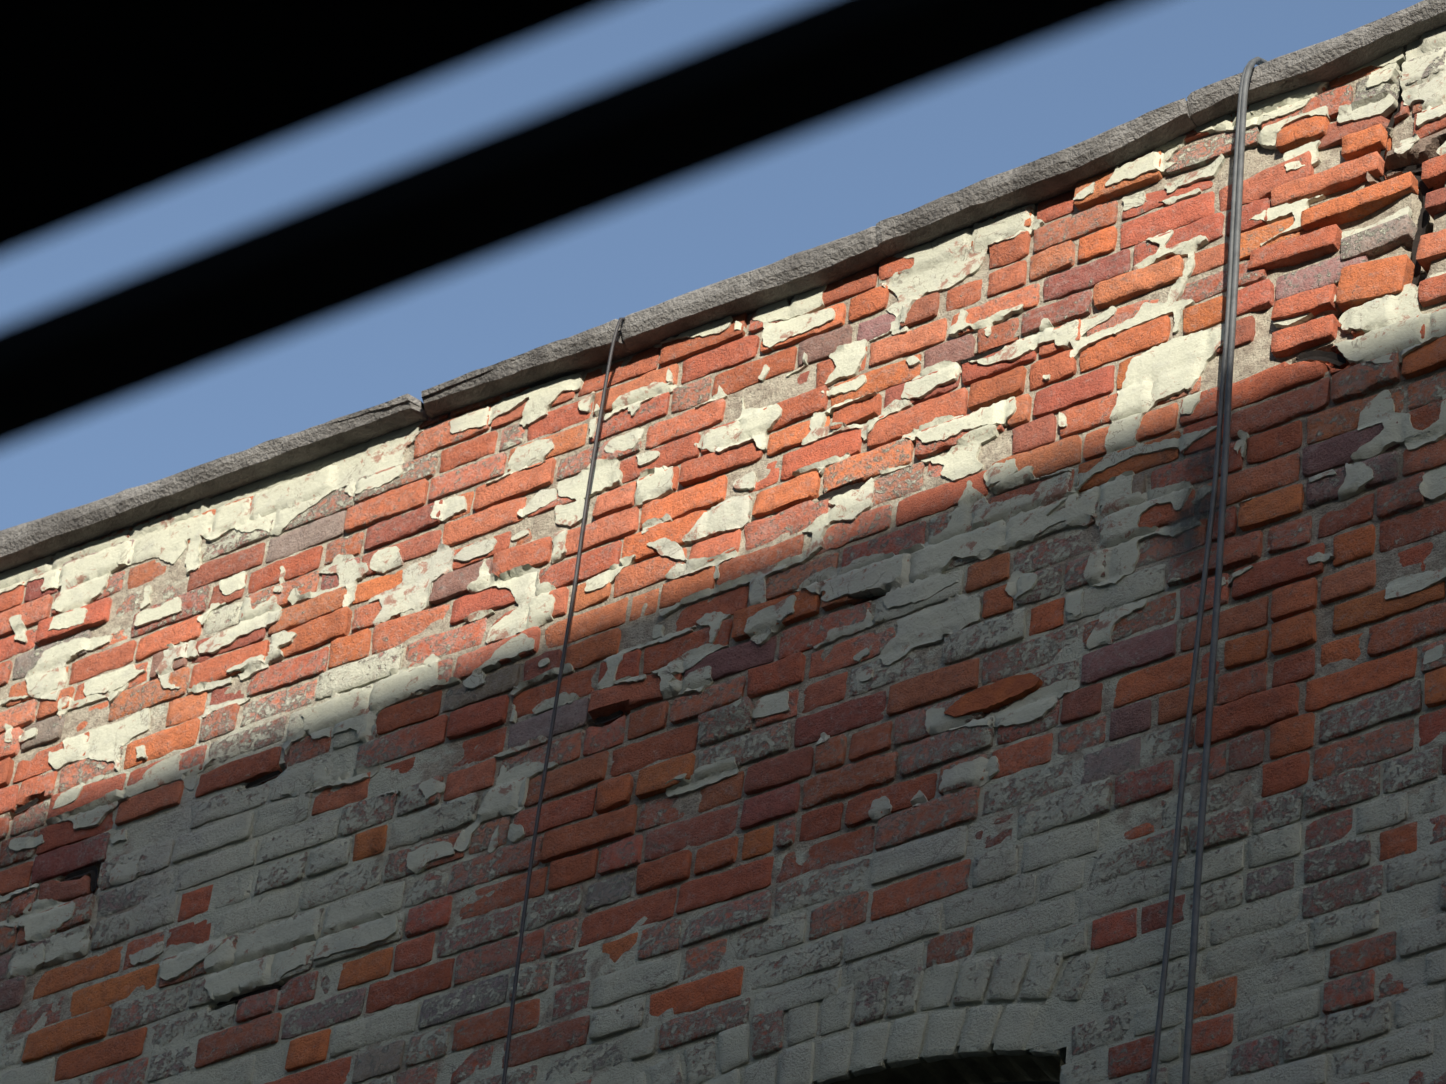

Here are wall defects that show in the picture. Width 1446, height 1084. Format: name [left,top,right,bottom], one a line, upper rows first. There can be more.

peeling [1073,26,1446,211]
peeling [1249,194,1326,247]
peeling [1341,206,1412,239]
crack [1379,75,1439,285]
peeling [1334,271,1446,365]
peeling [0,204,1225,755]
peeling [1309,390,1446,502]
peeling [1384,567,1446,600]
peeling [9,708,215,852]
peeling [407,735,558,875]
peeling [0,883,91,979]
peeling [129,904,398,1004]